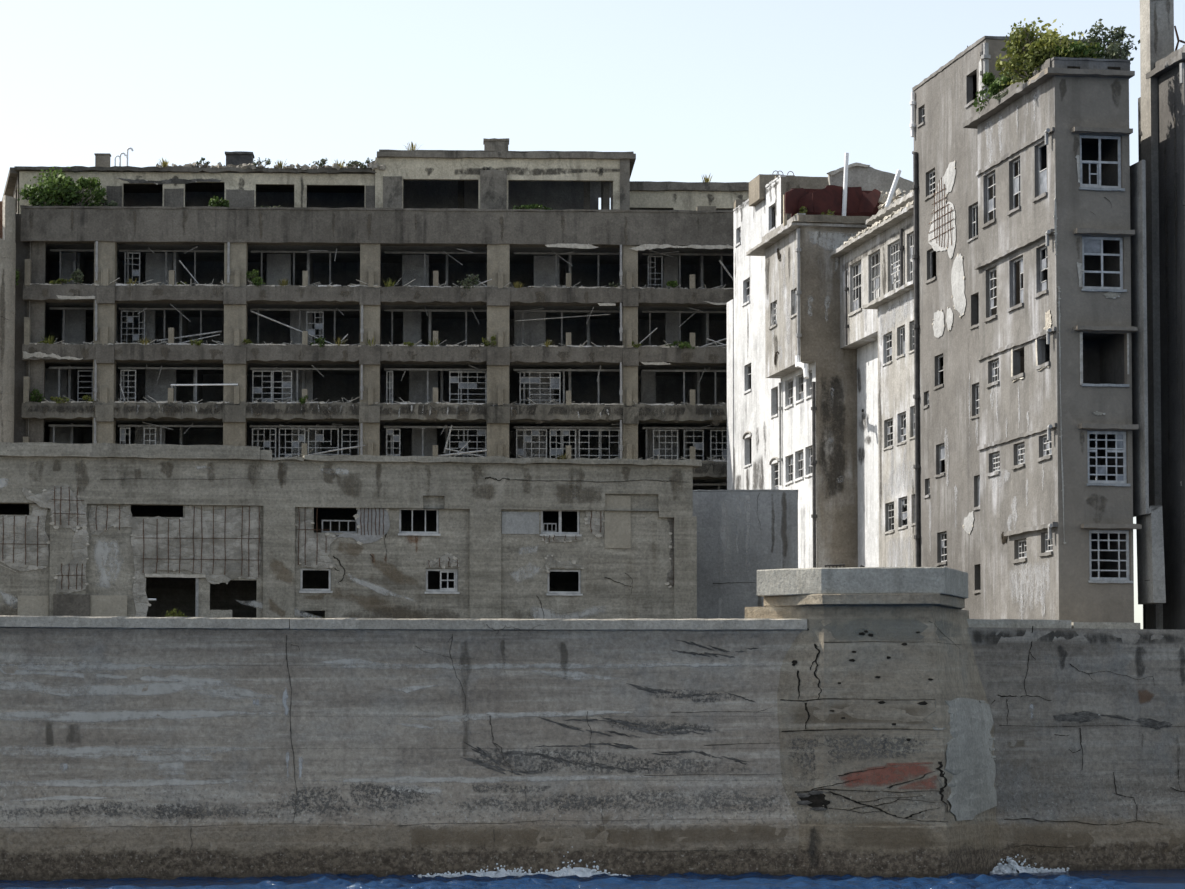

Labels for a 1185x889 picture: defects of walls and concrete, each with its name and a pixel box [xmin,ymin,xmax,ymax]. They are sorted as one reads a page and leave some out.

peeling [928,160,966,338]
leakage [820,378,845,495]
spalling [0,485,262,617]
spalling [295,507,390,569]
leakage [350,578,449,619]
crack [84,825,213,852]
crack [286,635,300,824]
crack [377,634,647,856]
crack [671,641,884,746]
crack [644,761,948,822]
crack [992,626,1137,769]
crack [1004,772,1160,848]